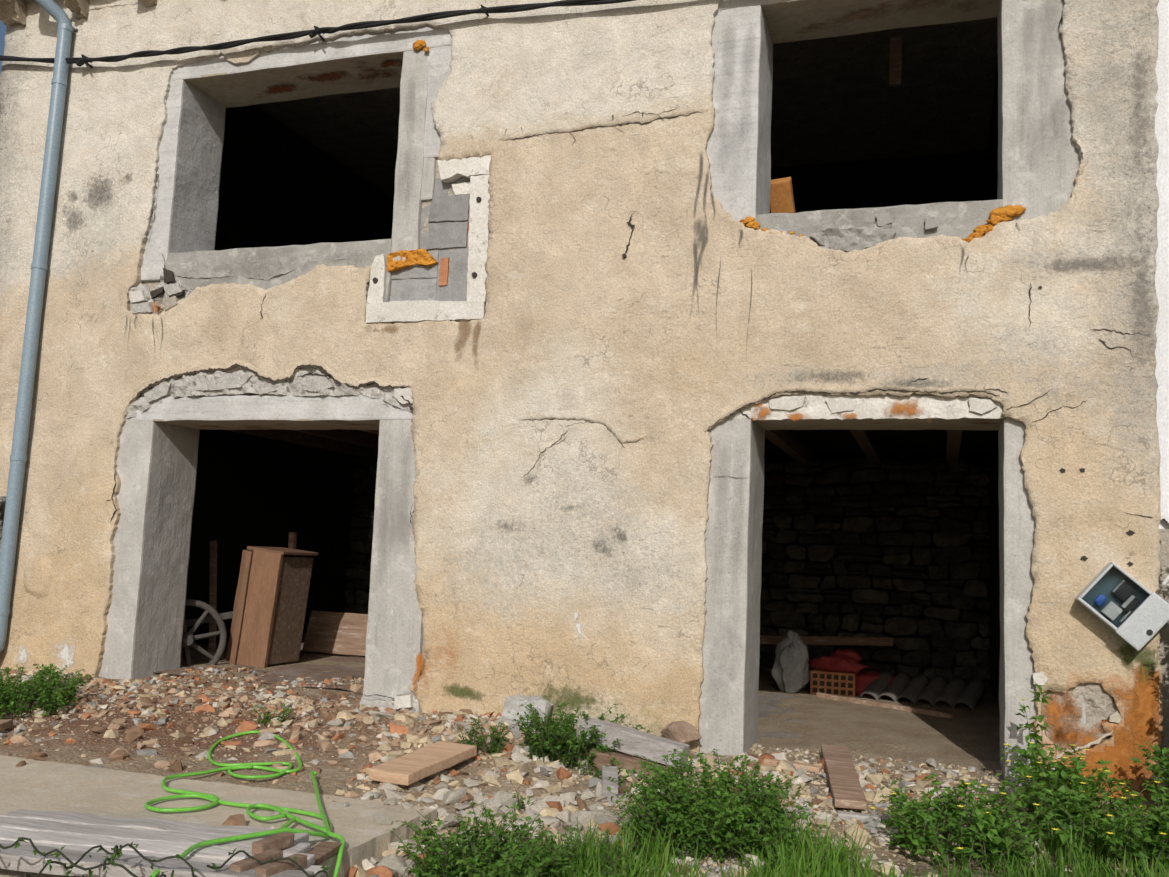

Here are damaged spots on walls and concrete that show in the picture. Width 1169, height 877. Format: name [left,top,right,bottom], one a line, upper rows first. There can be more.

crack [494,98,710,145]
leakage [693,157,715,292]
spalling [810,213,896,252]
spalling [126,367,413,419]
peeling [751,394,1002,421]
crack [703,378,1087,432]
rust [885,402,919,415]
crack [518,410,647,477]
spalling [1033,672,1121,770]
rust [1034,666,1160,792]